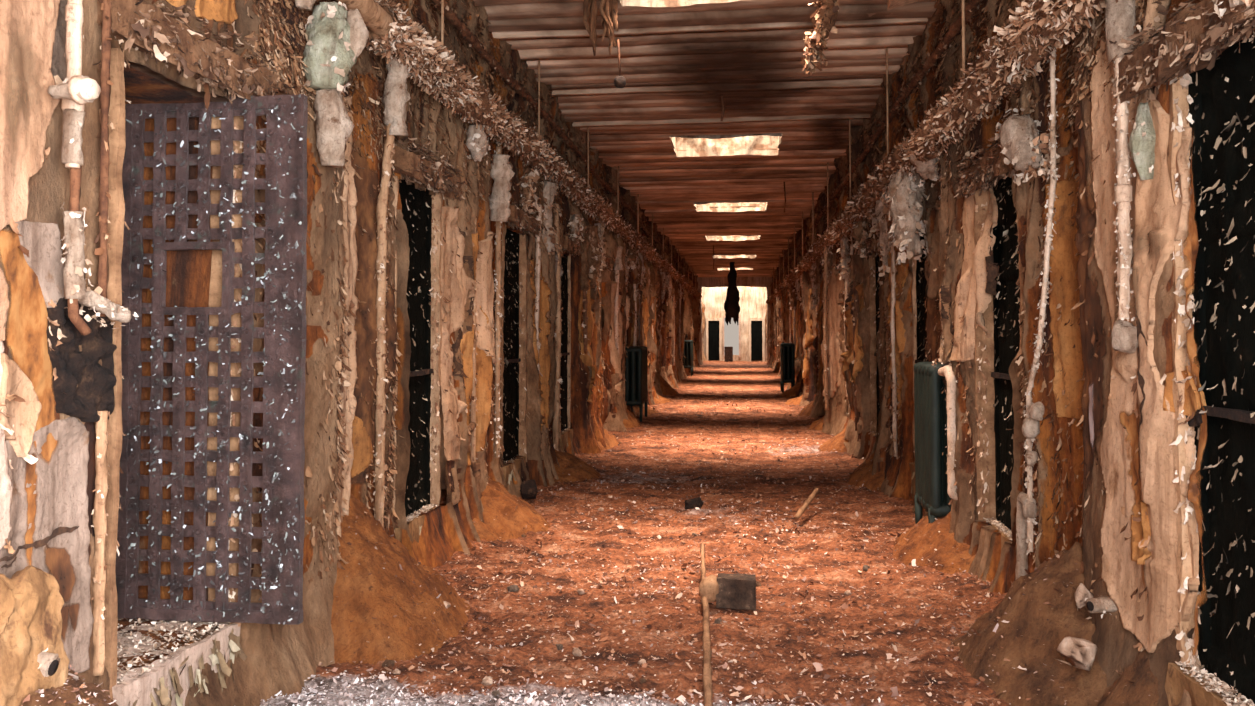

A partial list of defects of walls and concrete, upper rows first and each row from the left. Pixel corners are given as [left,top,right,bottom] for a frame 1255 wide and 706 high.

peeling [0,0,698,706]
peeling [770,0,1255,706]